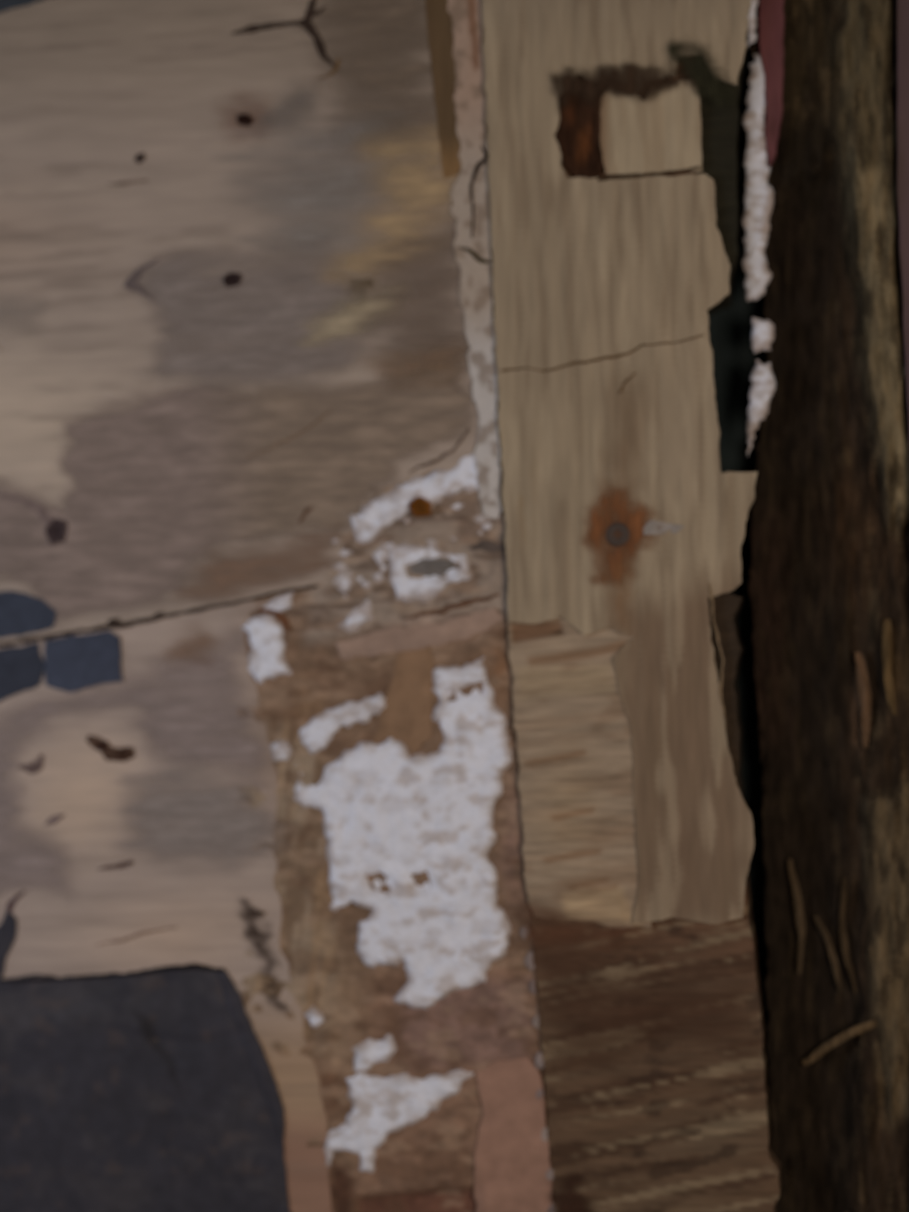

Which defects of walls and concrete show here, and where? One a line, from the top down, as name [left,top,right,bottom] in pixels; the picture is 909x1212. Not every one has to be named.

crack [232,0,341,79]
crack [501,334,704,394]
peeling [331,537,396,599]
rust [409,496,432,517]
rust [585,489,650,584]
peeling [0,591,124,701]
crack [0,585,318,647]
peeling [299,607,504,754]
peeling [86,735,136,762]
peeling [0,909,291,1212]
peeling [352,1034,397,1071]
peeling [474,1057,553,1212]